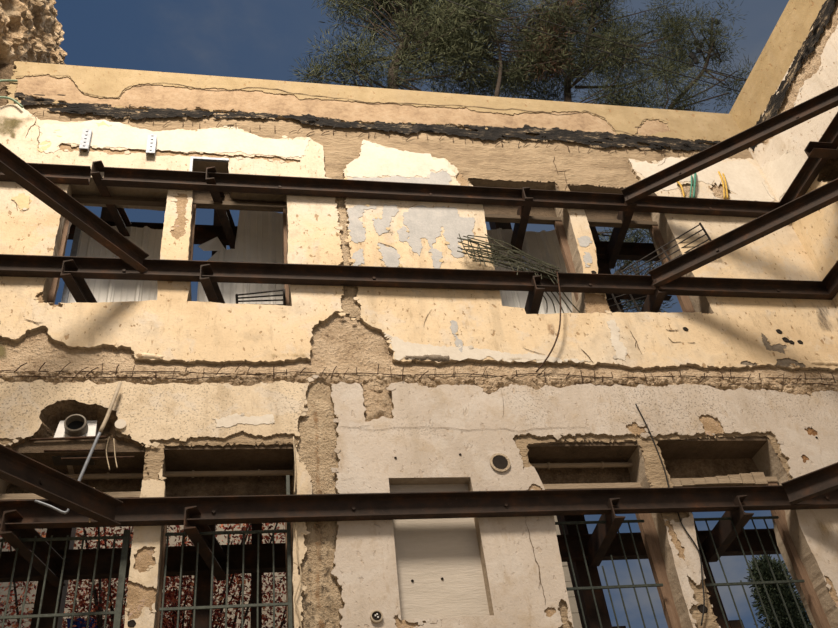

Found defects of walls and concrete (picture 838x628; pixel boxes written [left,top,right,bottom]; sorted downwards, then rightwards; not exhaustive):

peeling [0,63,616,163]
crack [22,74,669,135]
peeling [343,140,472,186]
spalling [170,191,189,240]
peeling [334,197,475,268]
spalling [338,286,360,321]
peeling [384,320,591,363]
spalling [761,329,805,368]
spalling [0,358,397,494]
spalling [513,413,791,480]
spalling [294,521,344,628]
spalling [544,600,571,628]